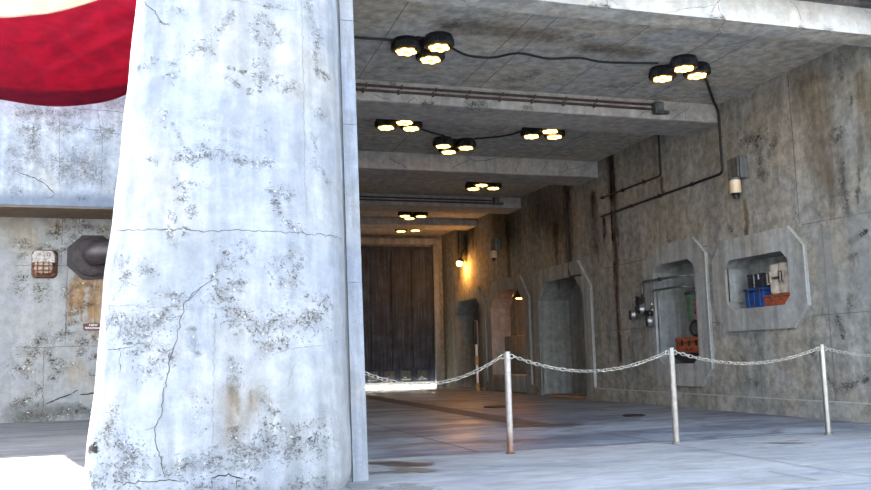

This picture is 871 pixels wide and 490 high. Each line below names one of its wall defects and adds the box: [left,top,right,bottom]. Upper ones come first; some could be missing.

crack [103,269,238,486]
crack [45,390,94,405]
leakage [368,461,440,474]